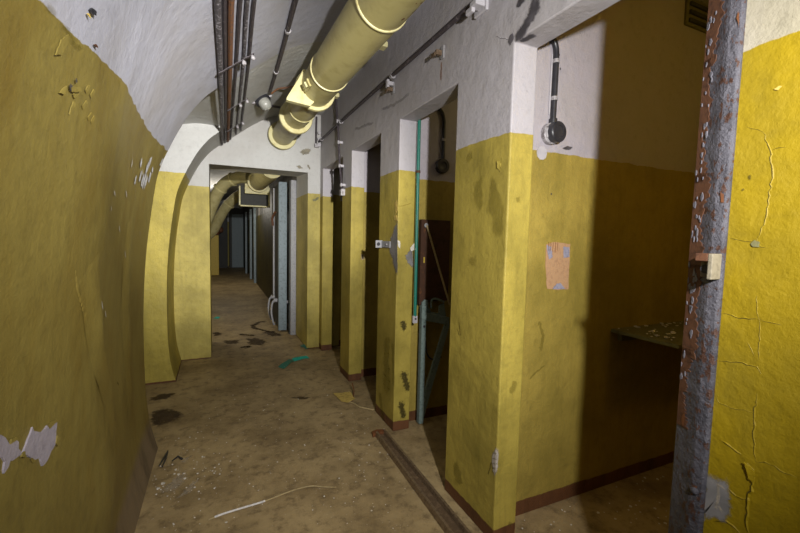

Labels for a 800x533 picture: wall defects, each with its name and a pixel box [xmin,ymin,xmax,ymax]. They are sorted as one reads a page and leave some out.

rust [676,0,725,430]
crack [731,127,784,248]
crack [722,297,781,373]
peeling [0,420,61,474]
crack [715,396,797,533]